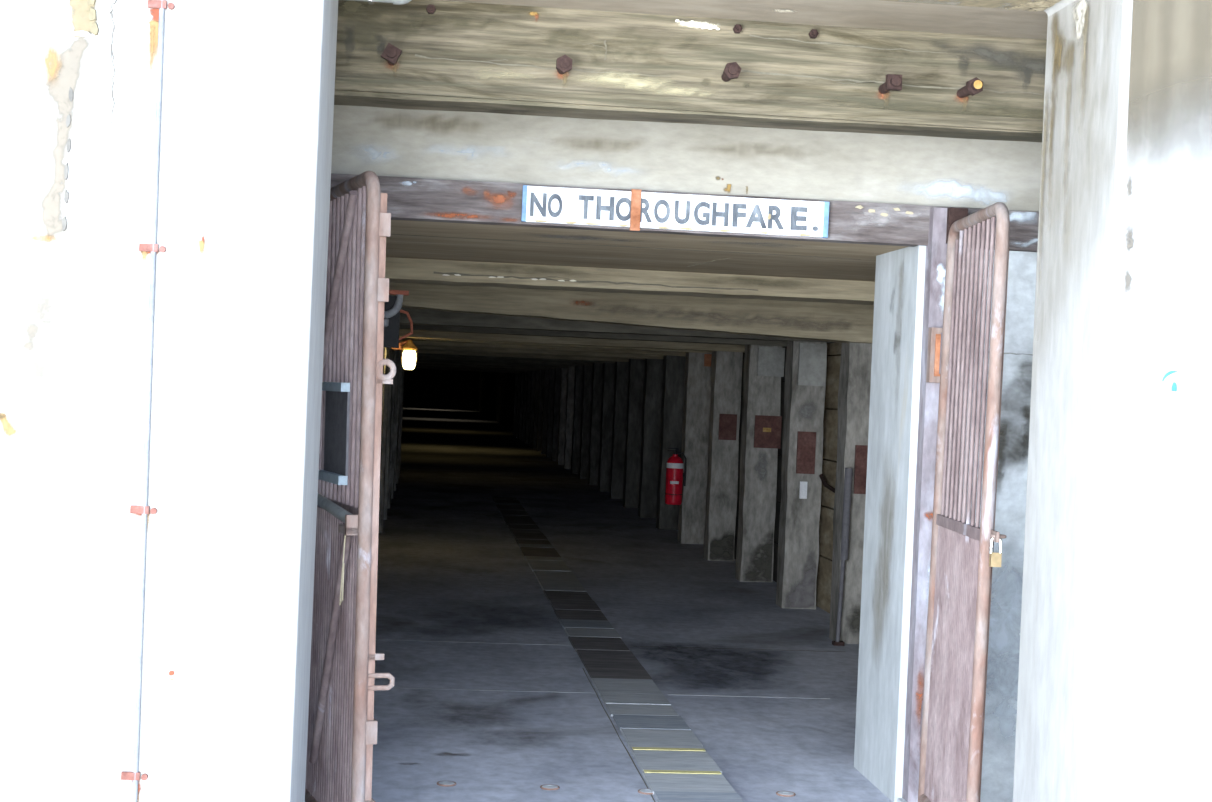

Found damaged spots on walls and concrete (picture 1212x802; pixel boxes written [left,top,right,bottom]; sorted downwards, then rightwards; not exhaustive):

peeling [31,0,99,241]
damp [1127,0,1212,128]
rust [484,191,516,204]
damp [997,408,1030,480]
damp [642,645,776,688]
damp [986,574,1022,728]